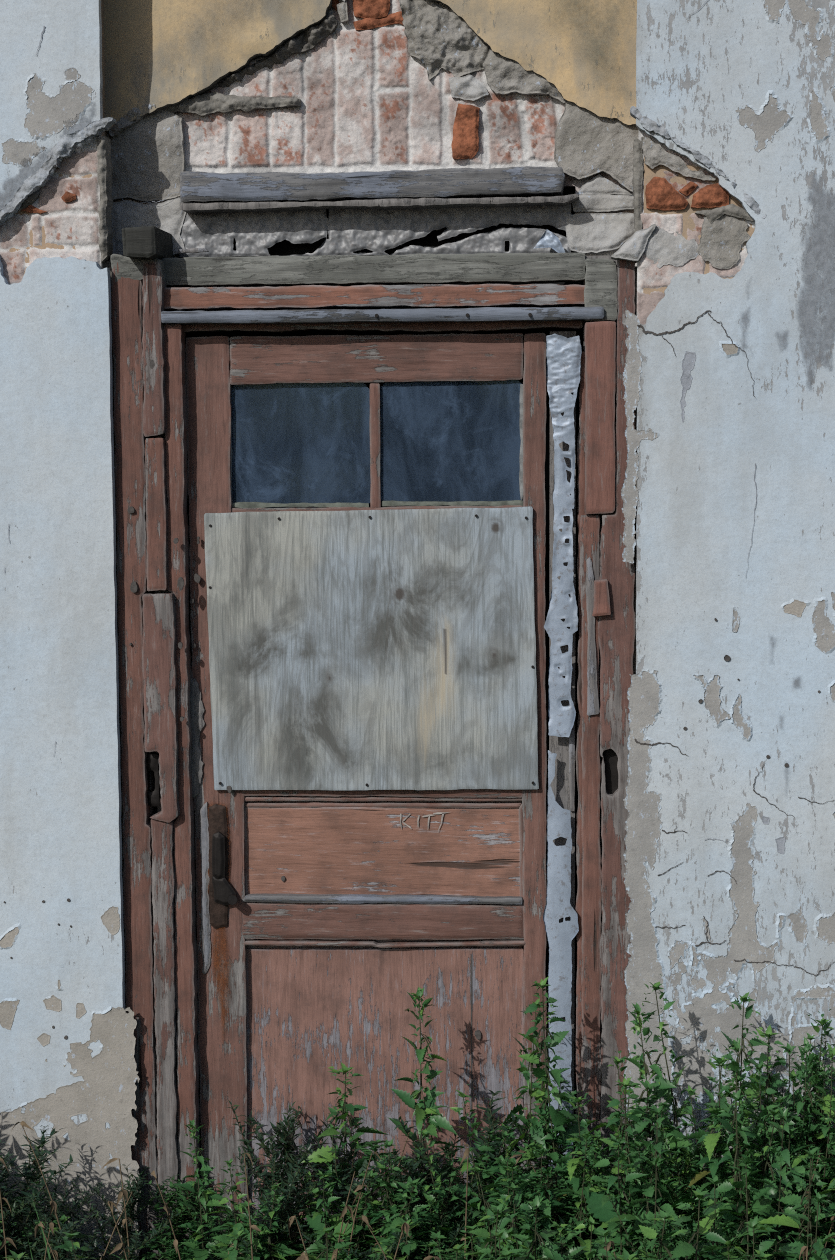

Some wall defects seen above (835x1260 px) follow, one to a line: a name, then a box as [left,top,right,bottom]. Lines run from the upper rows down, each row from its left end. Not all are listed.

peeling [761,0,835,61]
flaking render [0,0,755,564]
peeling [780,175,835,388]
crack [637,310,756,398]
peeling [732,605,740,632]
peeling [781,592,835,655]
peeling [0,923,22,959]
peeling [101,906,120,935]
peeling [623,669,835,1189]
peeling [0,980,141,1260]